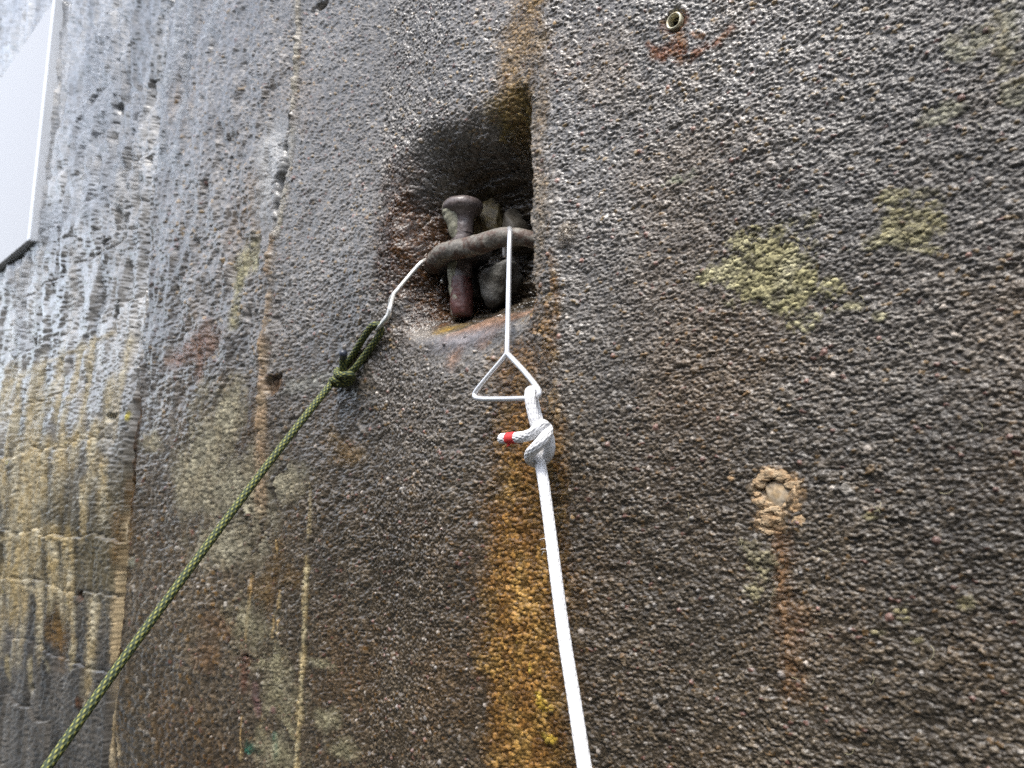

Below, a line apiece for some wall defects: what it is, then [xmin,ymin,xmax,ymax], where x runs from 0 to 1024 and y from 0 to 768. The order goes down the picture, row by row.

water stain [157,0,220,172]
water stain [290,0,300,108]
corrosion [646,15,734,61]
water stain [83,171,117,208]
water stain [231,127,294,324]
water stain [0,339,106,653]
spalling [751,467,806,536]
water stain [87,598,98,677]
water stain [110,520,129,662]
corrosion [484,354,561,768]
water stain [109,695,120,766]